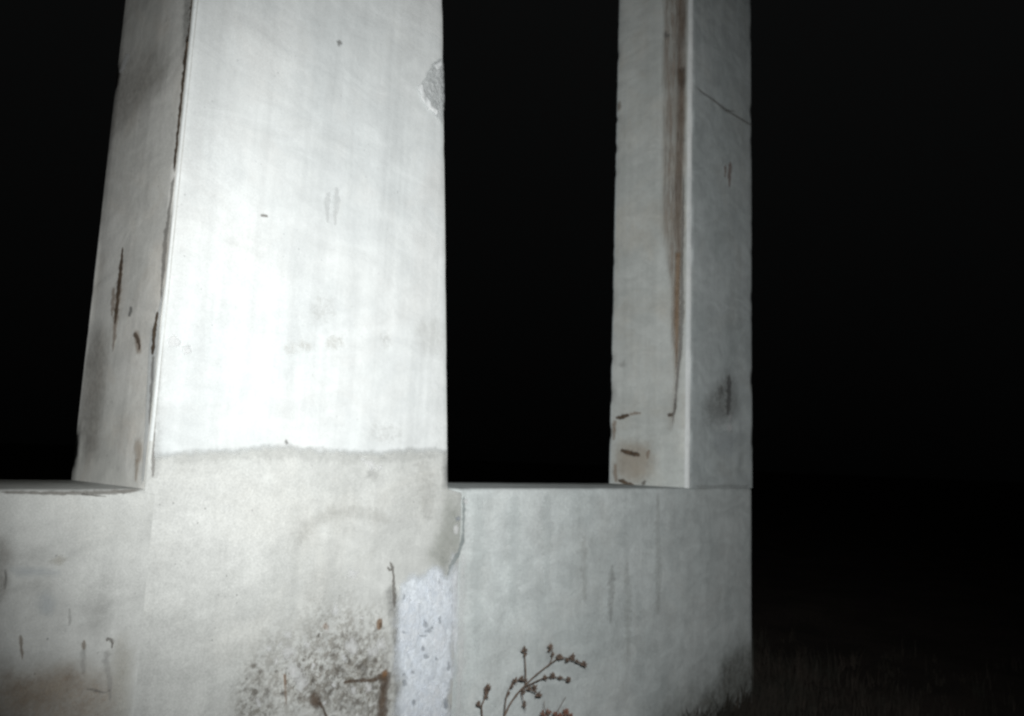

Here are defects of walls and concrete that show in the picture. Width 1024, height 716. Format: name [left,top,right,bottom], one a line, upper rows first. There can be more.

spalling [419,59,444,120]
corrosion [665,0,684,353]
corrosion [114,248,123,323]
water stain [267,625,383,707]
corrosion [344,671,389,716]
peeling [396,567,458,716]